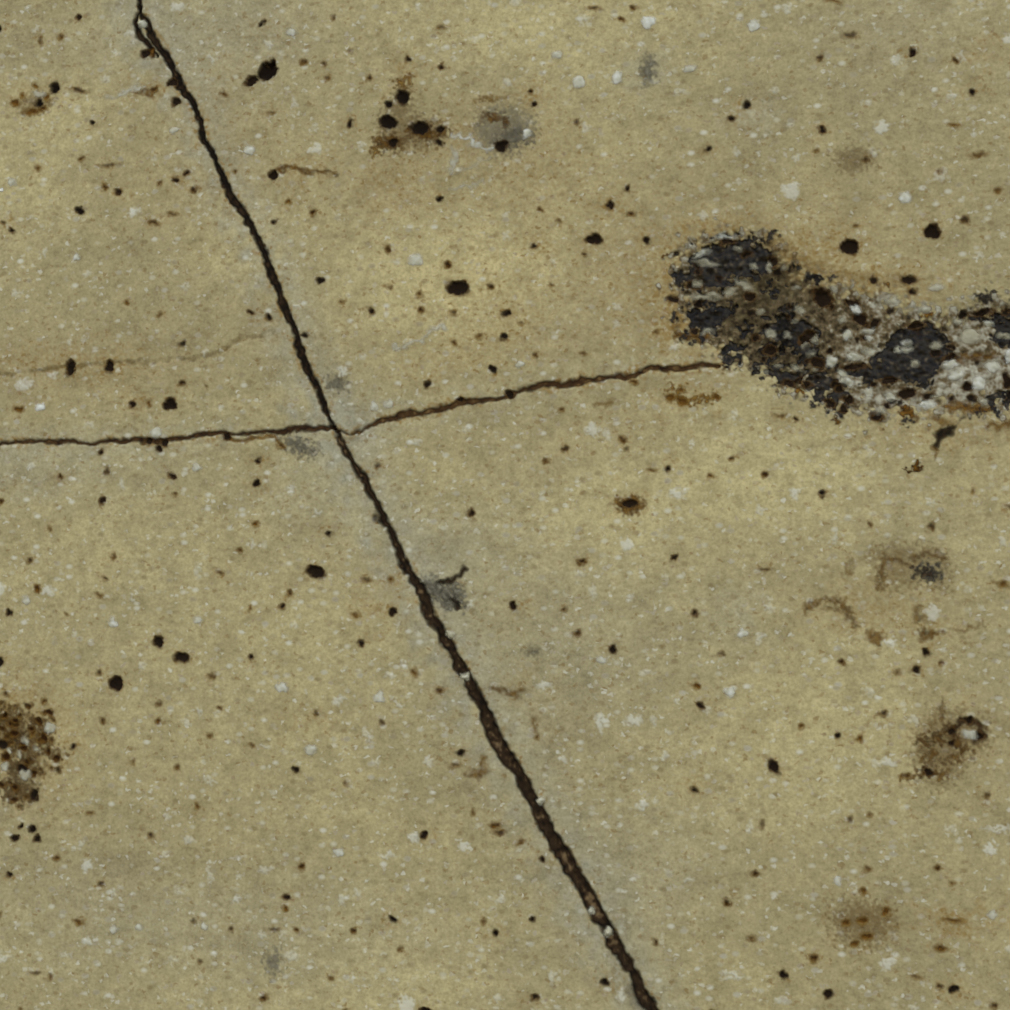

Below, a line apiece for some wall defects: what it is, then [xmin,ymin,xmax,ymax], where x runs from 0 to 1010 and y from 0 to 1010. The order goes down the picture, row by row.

spalling [656,218,1010,434]
crack [0,0,720,1010]
corrosion [901,716,987,782]